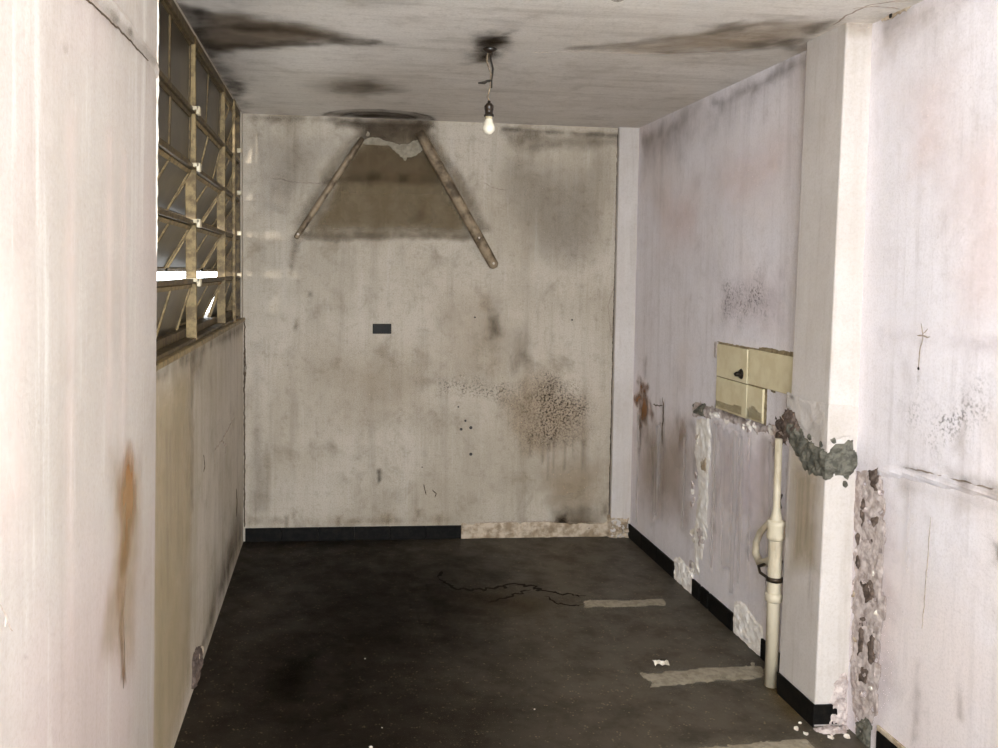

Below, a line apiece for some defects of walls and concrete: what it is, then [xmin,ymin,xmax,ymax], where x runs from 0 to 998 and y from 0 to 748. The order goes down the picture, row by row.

water stain [190,9,343,50]
water stain [540,390,582,440]
corrosion [634,382,653,422]
corrosion [121,456,135,571]
flaking render [461,521,608,539]
peeling [674,392,858,594]
crack [437,571,586,606]
flaking render [733,601,763,656]
spalling [794,468,887,748]